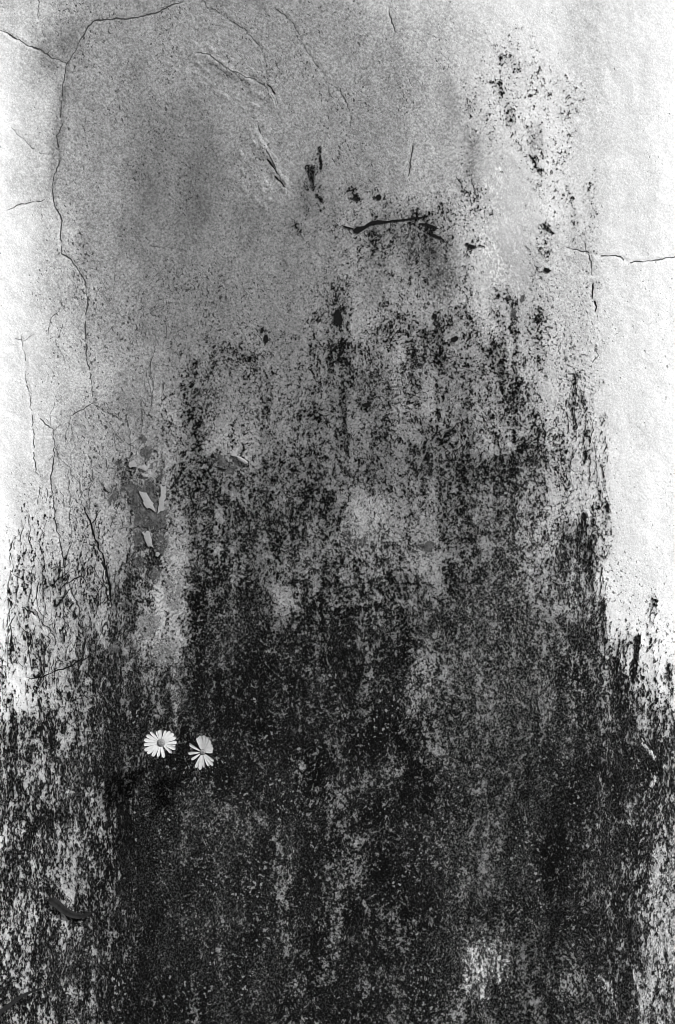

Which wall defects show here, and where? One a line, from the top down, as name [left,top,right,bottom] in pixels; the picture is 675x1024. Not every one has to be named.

crack [1,0,285,744]
water stain [337,179,381,209]
crack [566,243,675,312]
peeling [108,432,184,733]